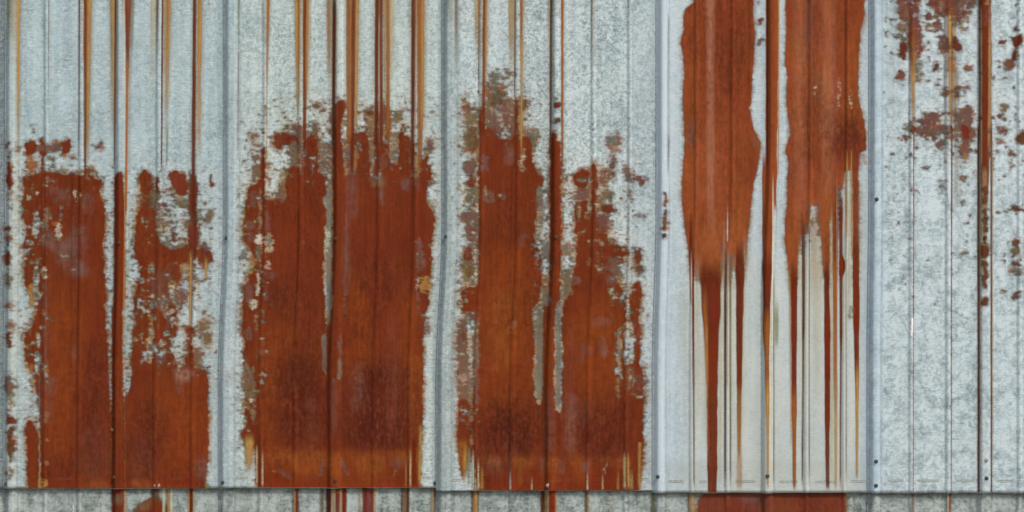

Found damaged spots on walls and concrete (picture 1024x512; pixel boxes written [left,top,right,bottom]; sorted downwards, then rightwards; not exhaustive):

rust [3,0,213,512]
rust [238,0,436,512]
rust [454,0,648,512]
rust [680,0,867,512]
rust [883,0,1024,512]